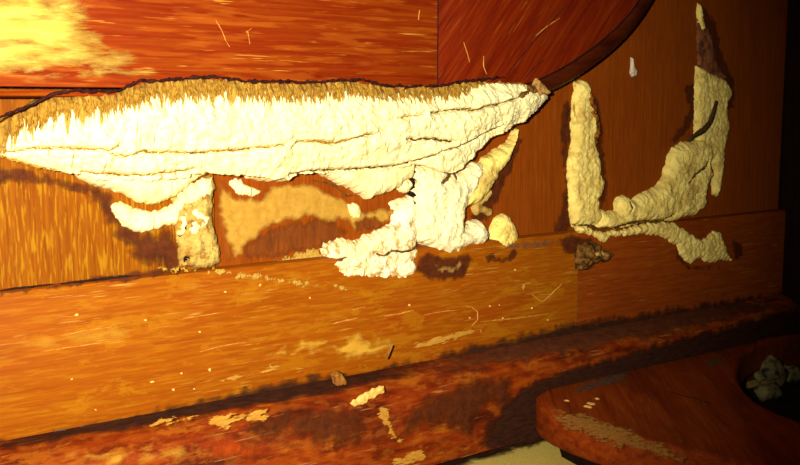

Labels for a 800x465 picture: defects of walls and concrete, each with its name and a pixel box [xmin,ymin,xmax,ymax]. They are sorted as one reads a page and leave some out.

leakage [696,3,734,109]
leakage [471,140,522,221]
leakage [561,102,571,176]
leakage [594,99,607,202]
leakage [673,83,694,142]
leakage [62,183,179,282]
leakage [245,218,344,258]
leakage [417,253,470,280]
leakage [555,189,592,254]
peeling [208,409,269,429]
peeling [377,407,404,442]
peeling [392,450,426,465]